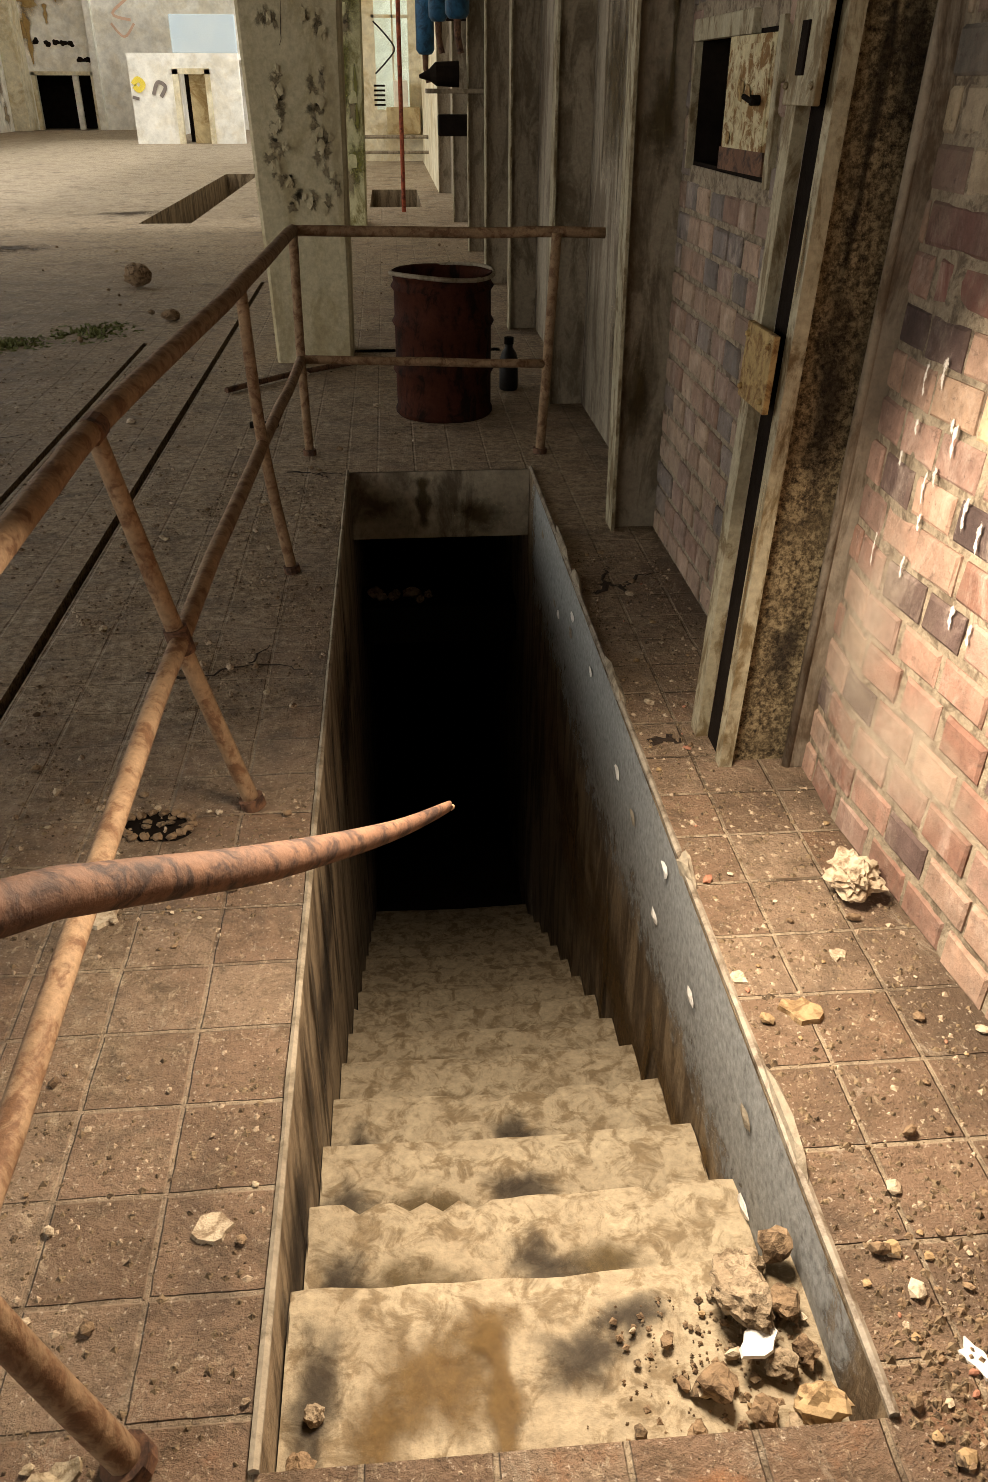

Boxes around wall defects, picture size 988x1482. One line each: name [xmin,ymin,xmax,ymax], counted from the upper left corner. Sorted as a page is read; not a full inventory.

water stain [922,358,949,395]
water stain [416,478,430,526]
water stain [916,419,958,530]
water stain [960,498,982,555]
water stain [552,1295,661,1383]